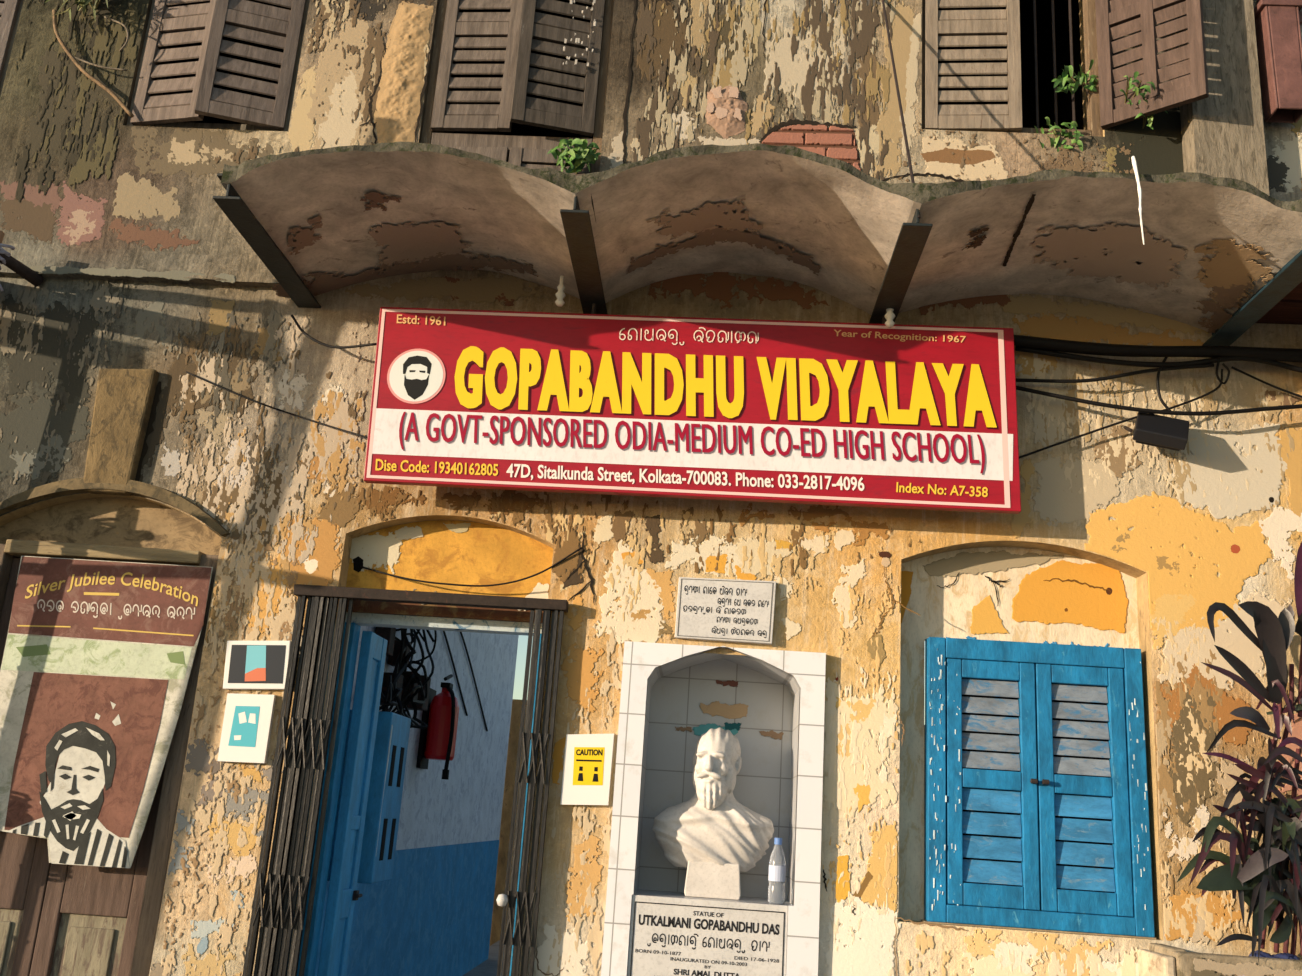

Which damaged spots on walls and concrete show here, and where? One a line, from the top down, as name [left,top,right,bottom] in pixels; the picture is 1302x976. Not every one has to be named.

leakage [0,0,274,244]
flaking render [167,137,233,166]
flaking render [277,0,390,153]
leakage [308,0,435,145]
leakage [626,199,821,276]
peeling [0,265,423,976]
peeling [443,523,471,533]
crack [870,567,921,639]
peeling [966,313,1302,945]
flaking render [519,506,1139,976]